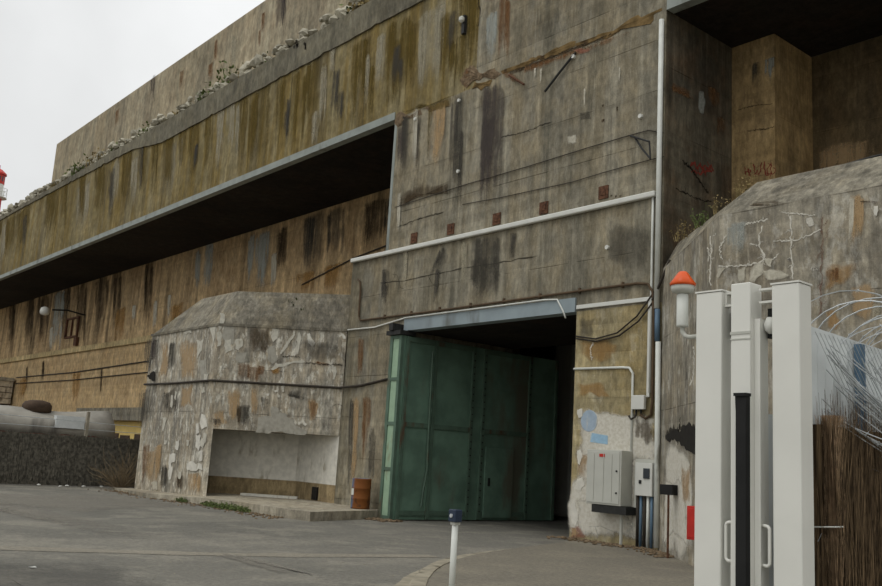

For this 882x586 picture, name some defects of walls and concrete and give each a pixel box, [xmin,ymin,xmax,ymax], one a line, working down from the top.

water stain [439,0,497,74]
water stain [238,43,373,149]
water stain [401,112,419,165]
water stain [431,97,463,190]
water stain [364,184,442,238]
crack [707,211,821,285]
water stain [9,272,122,347]
peeling [170,313,250,408]
peeling [251,328,318,435]
peeling [162,391,239,480]
peeling [570,477,585,537]
peeling [664,419,695,560]